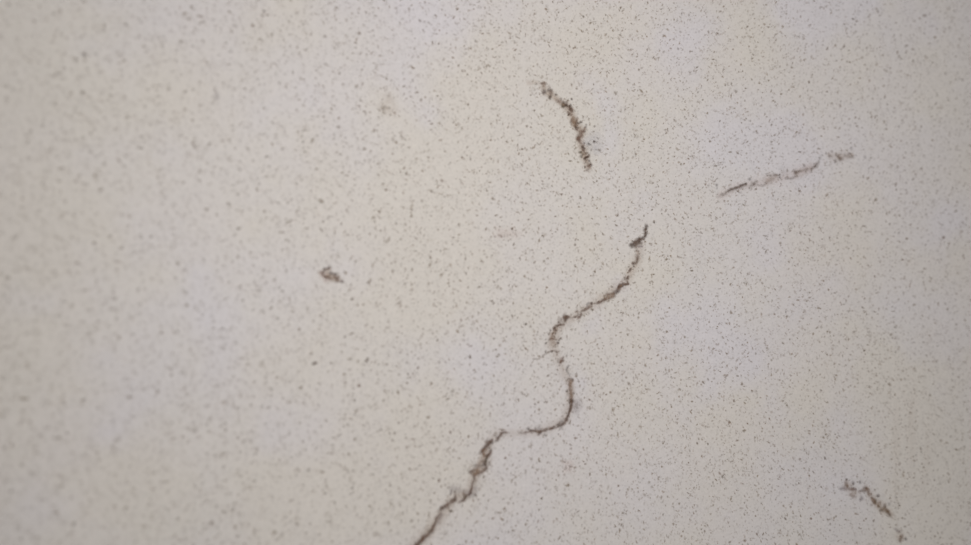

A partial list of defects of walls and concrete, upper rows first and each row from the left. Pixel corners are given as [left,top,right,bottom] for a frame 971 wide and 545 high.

crack [549,91,595,167]
crack [415,226,647,545]